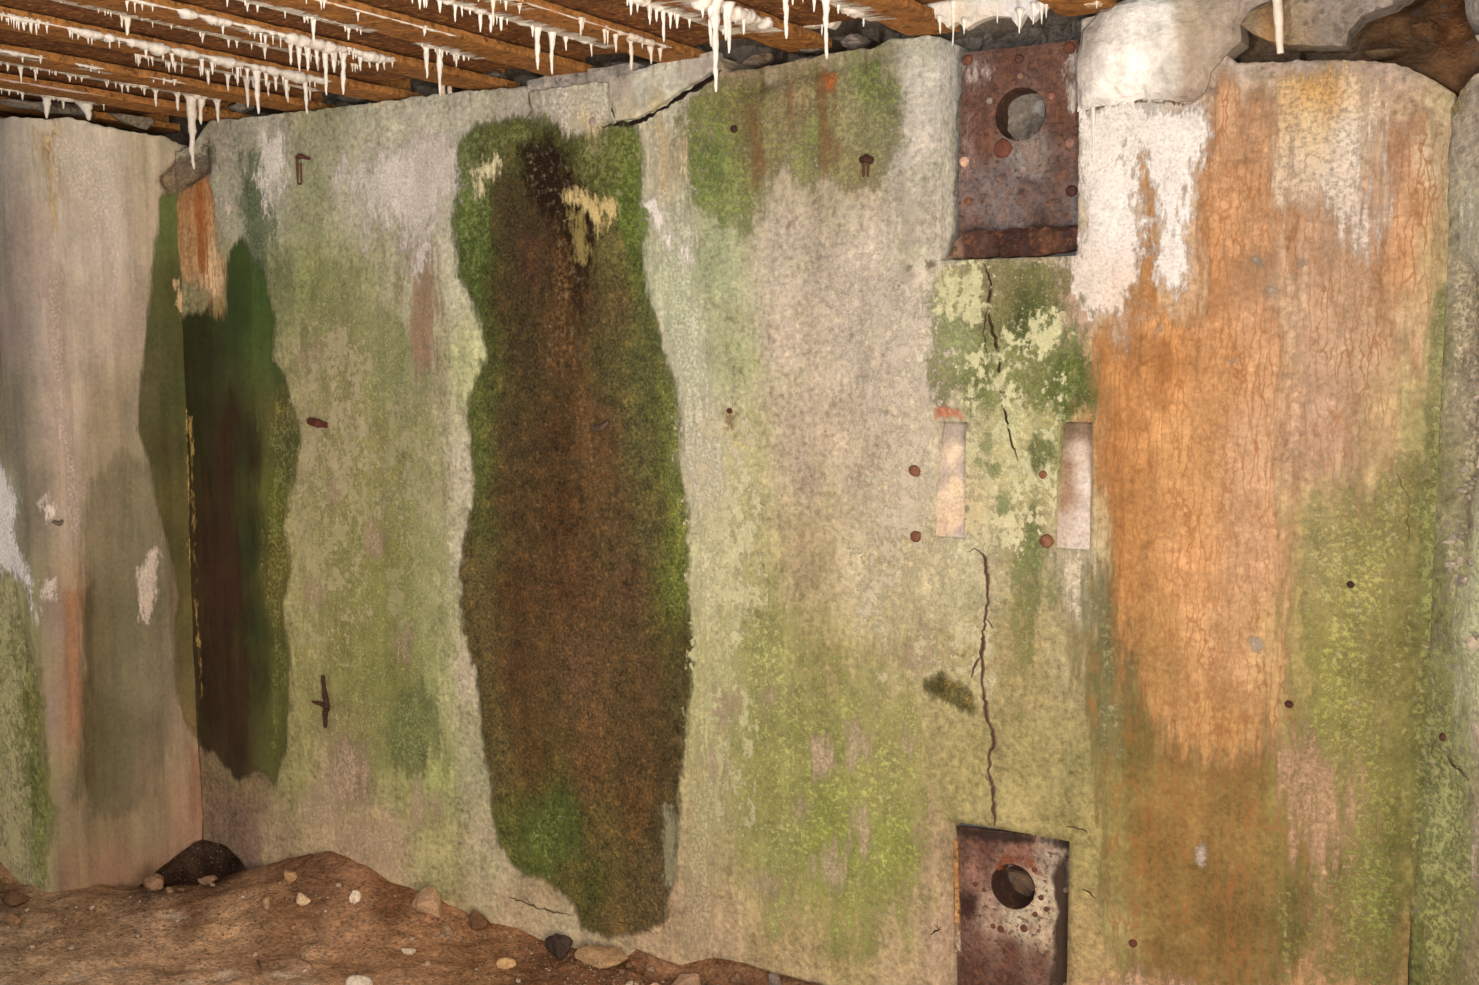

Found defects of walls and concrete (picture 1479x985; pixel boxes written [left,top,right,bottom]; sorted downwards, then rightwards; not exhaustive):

damp [0,266,85,885]
rust [177,176,227,320]
damp [139,114,476,785]
crack [969,548,997,826]
crack [982,264,1018,461]
damp [1060,99,1212,363]
damp [1050,547,1311,985]
rust [1092,71,1445,774]
rust [956,826,1069,985]